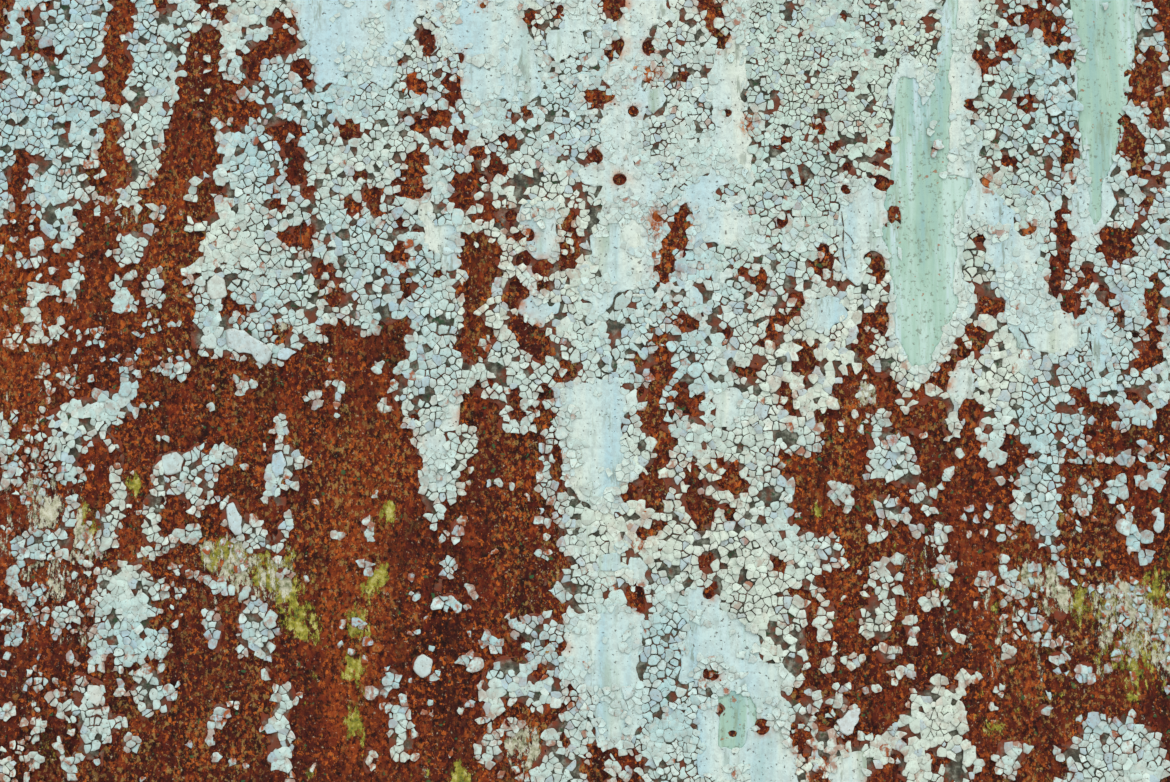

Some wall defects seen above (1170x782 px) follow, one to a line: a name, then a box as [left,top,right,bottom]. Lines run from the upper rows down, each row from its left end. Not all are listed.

corrosion [972,0,1076,77]
corrosion [649,205,692,286]
crack [841,211,854,268]
corrosion [1022,208,1170,376]
corrosion [0,0,650,782]
corrosion [618,310,751,541]
peeling [855,384,958,612]
corrosion [766,292,1170,782]
peeling [1102,473,1164,566]
peeling [853,552,920,663]
peeling [973,554,1096,685]
peeling [363,645,441,774]